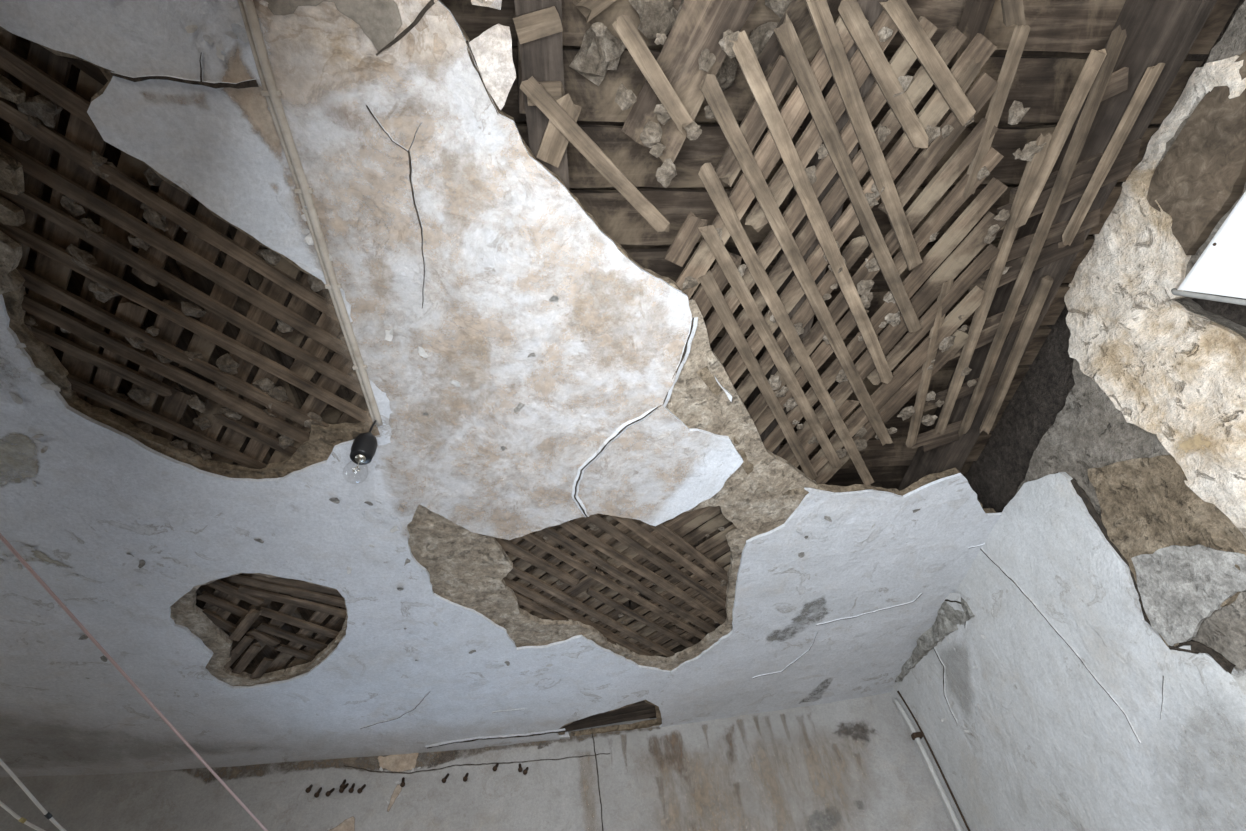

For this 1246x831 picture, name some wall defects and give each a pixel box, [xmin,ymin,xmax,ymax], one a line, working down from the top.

crack [110,52,259,89]
flaking render [259,0,402,51]
flaking render [0,23,380,479]
crack [366,104,425,308]
damp [253,0,699,540]
flaking render [390,0,1246,695]
peeling [0,434,48,487]
flaking render [170,573,348,686]
flaking render [558,700,662,739]
damp [803,723,869,830]